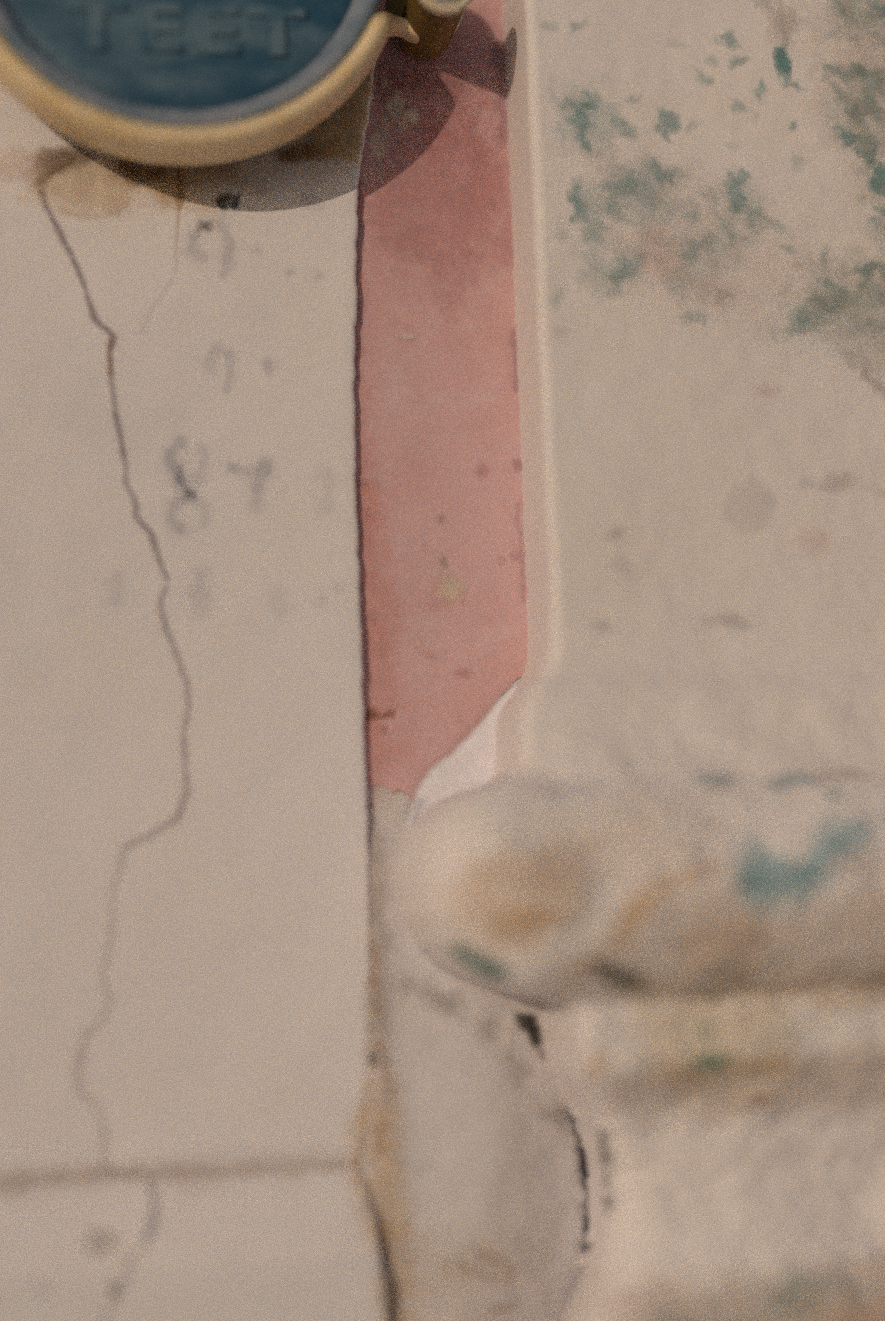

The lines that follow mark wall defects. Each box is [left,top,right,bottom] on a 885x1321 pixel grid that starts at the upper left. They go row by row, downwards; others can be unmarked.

water stain [279,80,372,161]
crack [39,163,71,184]